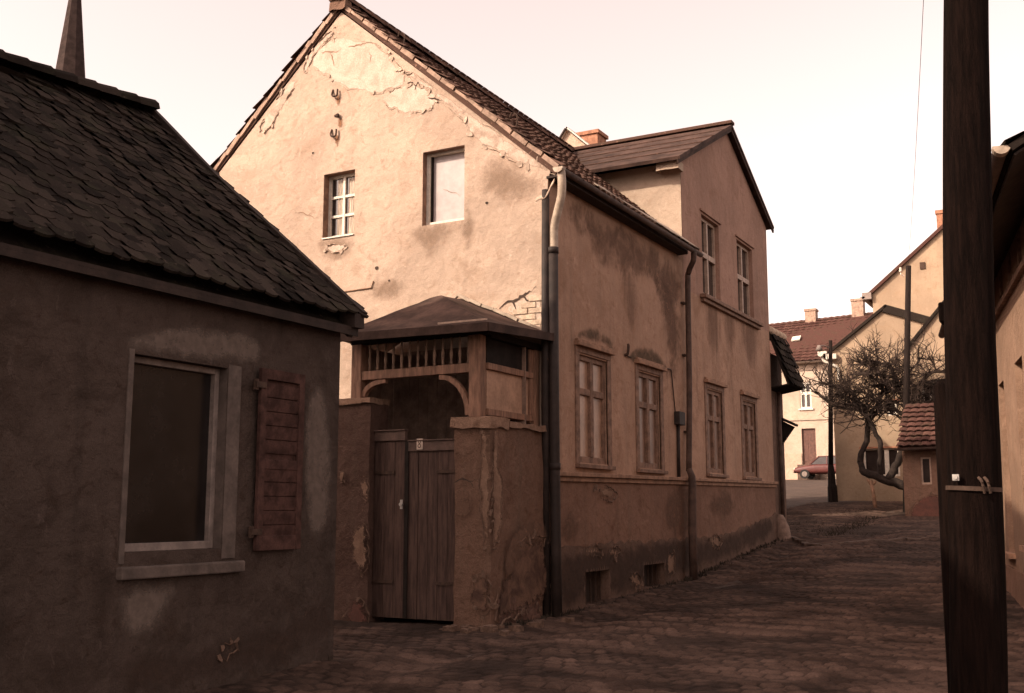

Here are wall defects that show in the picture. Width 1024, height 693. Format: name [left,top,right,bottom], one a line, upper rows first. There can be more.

spalling [257,26,555,175]
spalling [323,243,348,254]
crack [499,286,536,309]
water stain [575,214,680,365]
spalling [478,428,503,550]
flaking render [352,521,370,578]
water stain [562,520,772,604]